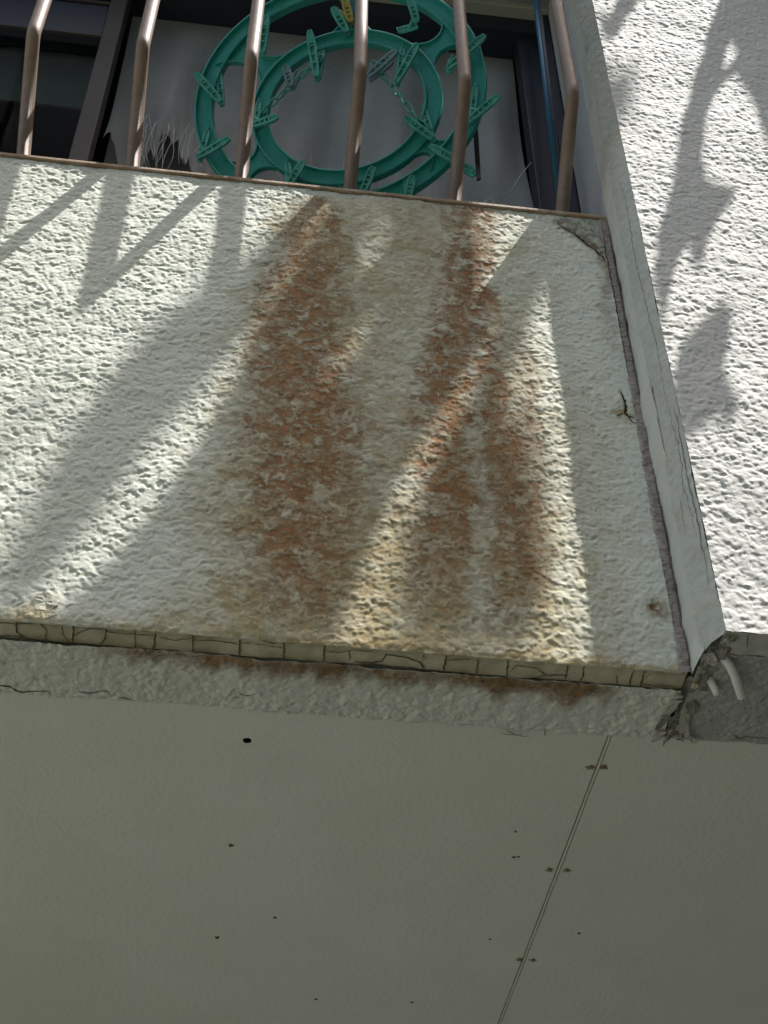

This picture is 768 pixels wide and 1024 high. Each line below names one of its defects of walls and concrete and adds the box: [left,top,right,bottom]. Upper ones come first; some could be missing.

rust [206,197,364,644]
rust [376,208,560,655]
crack [556,184,709,690]
crack [0,622,285,662]
rust [199,654,351,679]
crack [322,646,587,685]
rust [453,675,607,704]
spalling [651,636,739,746]